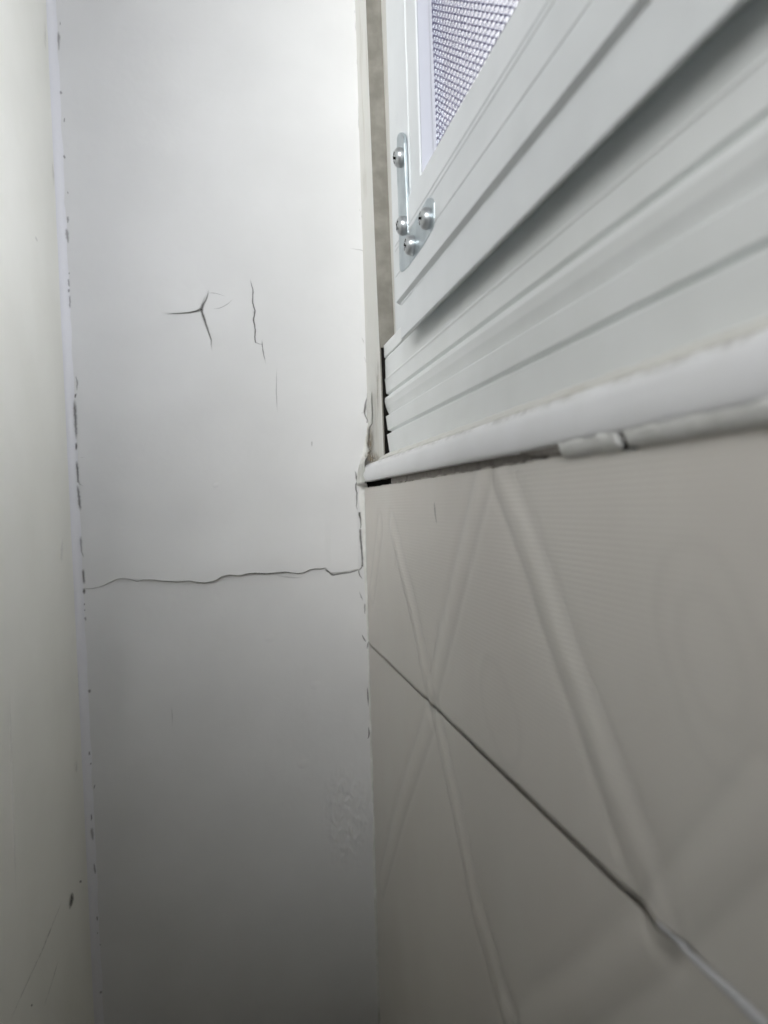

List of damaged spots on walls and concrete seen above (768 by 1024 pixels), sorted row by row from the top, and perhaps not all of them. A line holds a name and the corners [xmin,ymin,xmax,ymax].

crack [251,284,264,354]
crack [73,394,81,506]
crack [82,391,372,605]